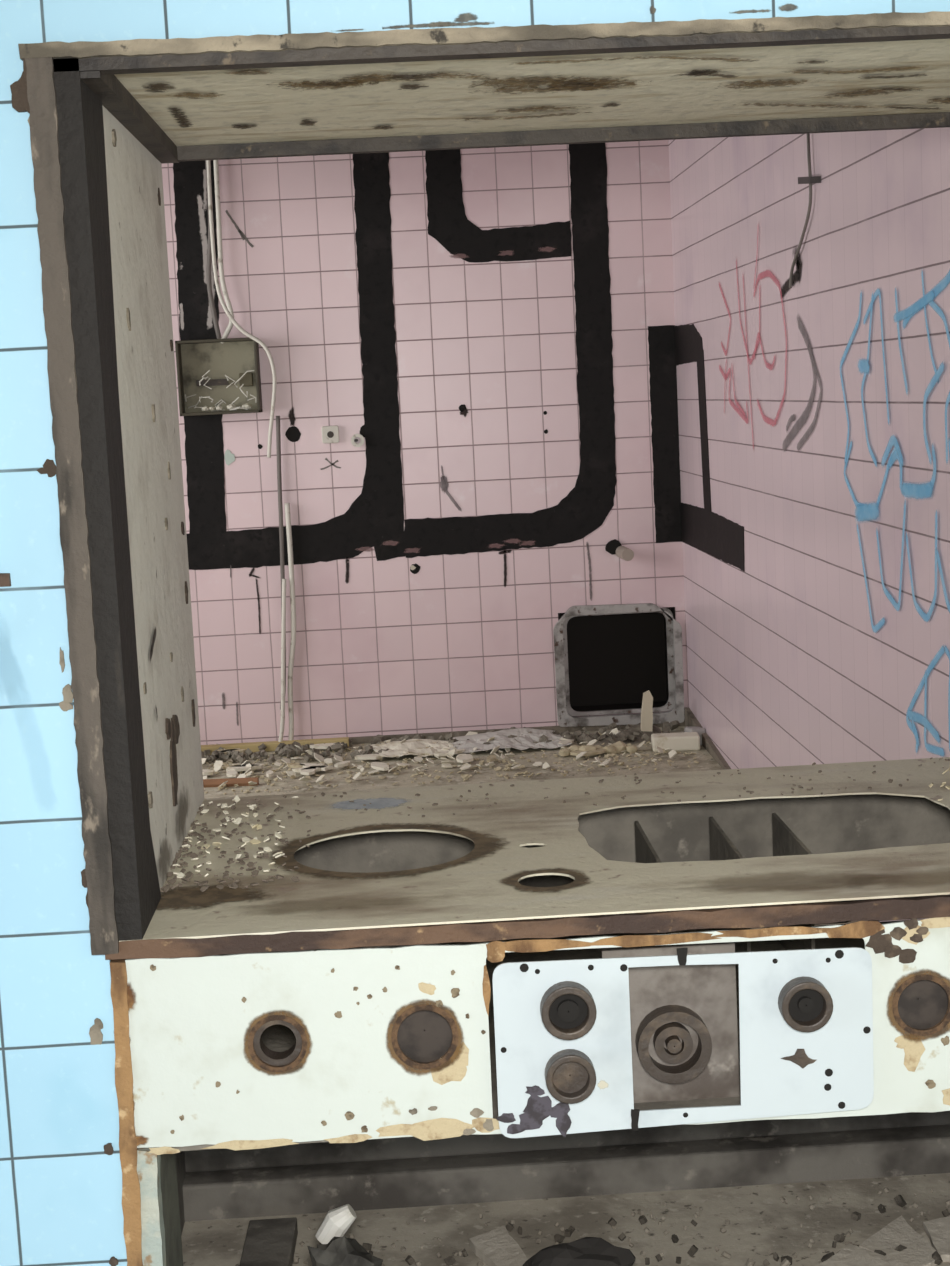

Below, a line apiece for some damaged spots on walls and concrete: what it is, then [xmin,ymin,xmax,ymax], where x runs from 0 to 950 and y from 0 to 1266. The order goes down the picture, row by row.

rust [127,984,135,1011]
peeling [418,970,460,1007]
peeling [482,917,950,1016]
rust [887,970,950,1041]
rust [244,1011,312,1075]
rust [386,1000,463,1075]
peeling [431,1042,469,1085]
peeling [147,1115,184,1155]
peeling [201,1138,299,1151]
peeling [321,1085,572,1143]